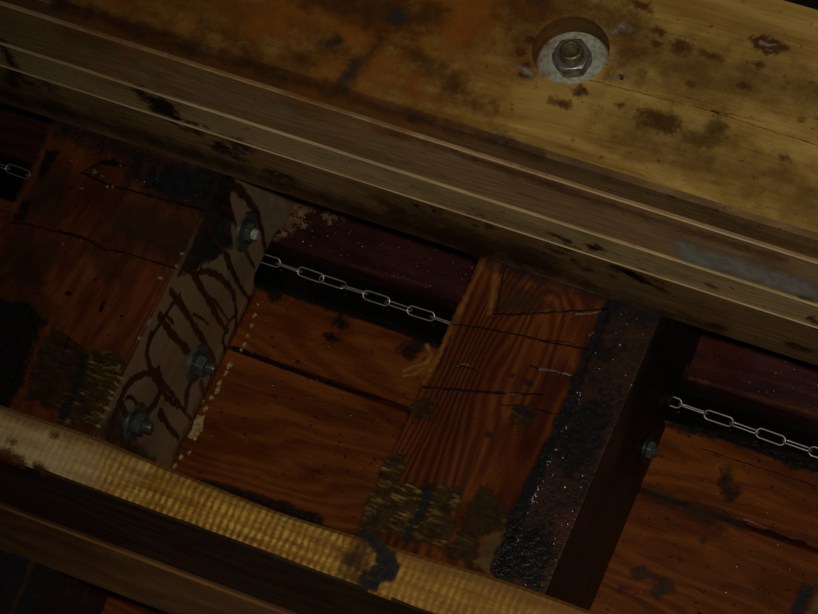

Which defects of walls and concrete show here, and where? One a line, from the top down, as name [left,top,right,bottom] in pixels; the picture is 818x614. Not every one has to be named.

damp [749,35,789,55]
damp [0,39,254,212]
crack [81,158,207,212]
crack [10,222,175,269]
crack [451,308,606,351]
crack [423,365,556,415]